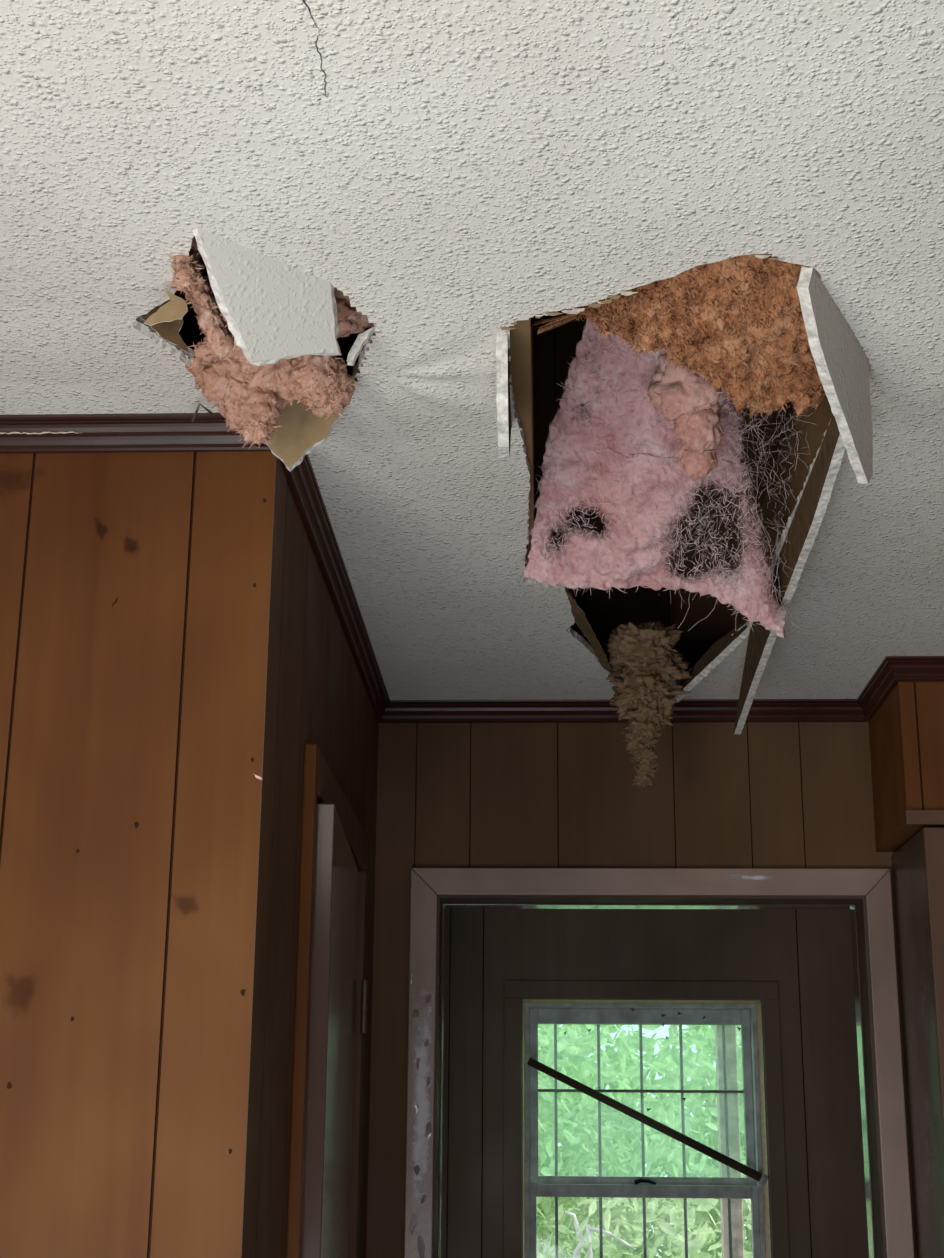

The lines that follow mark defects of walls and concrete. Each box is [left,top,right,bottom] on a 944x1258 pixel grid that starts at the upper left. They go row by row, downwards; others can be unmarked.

crack [302,0,327,98]
spalling [347,327,375,366]